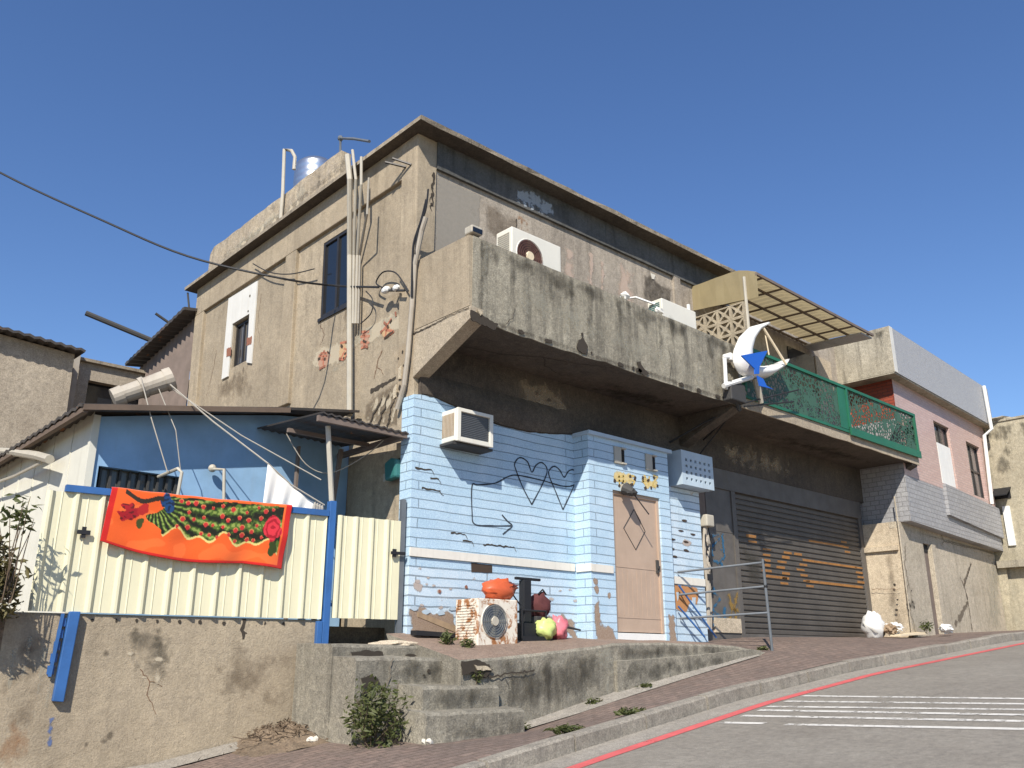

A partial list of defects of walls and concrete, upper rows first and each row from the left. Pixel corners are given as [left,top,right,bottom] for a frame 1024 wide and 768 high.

peeling [518,191,554,214]
peeling [312,313,399,370]
peeling [414,567,452,593]
crack [941,535,983,629]
peeling [409,604,456,633]
peeling [593,578,616,639]
crack [140,669,162,714]